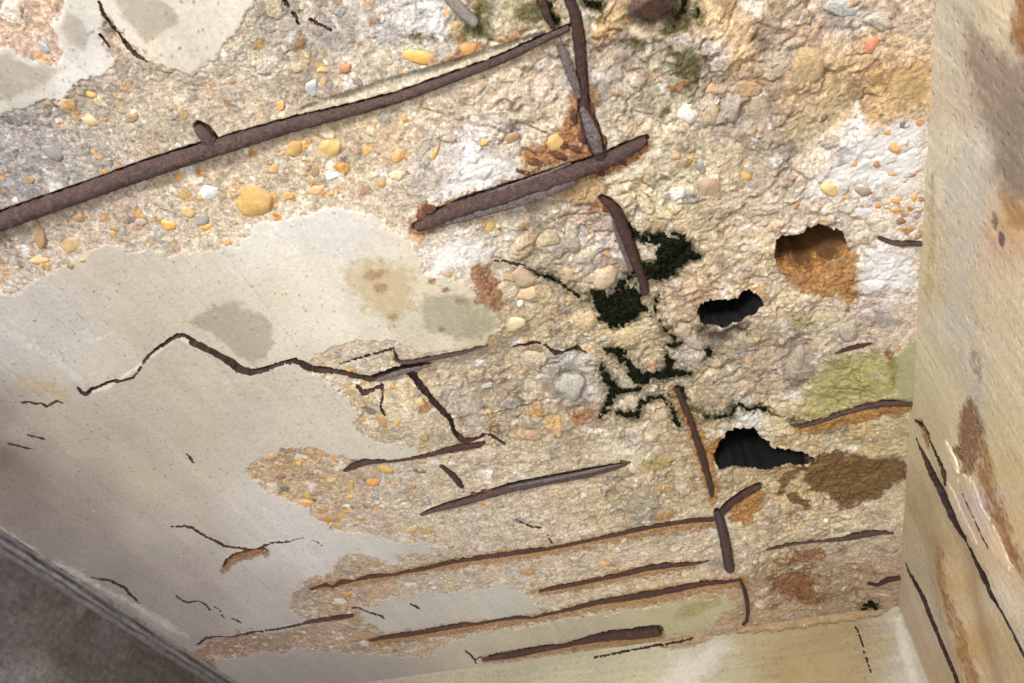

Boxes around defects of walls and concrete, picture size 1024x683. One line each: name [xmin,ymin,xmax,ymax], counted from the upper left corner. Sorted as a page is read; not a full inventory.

corrosion [408,0,652,235]
spalling [699,176,722,200]
spalling [593,265,618,290]
crack [21,333,506,446]
spalling [614,325,642,348]
crack [170,525,323,567]
spalling [194,554,487,669]
corrosion [307,385,765,592]
corrosion [366,560,748,646]
crack [905,563,960,683]
crack [914,419,1024,658]
corrosion [952,397,1024,572]